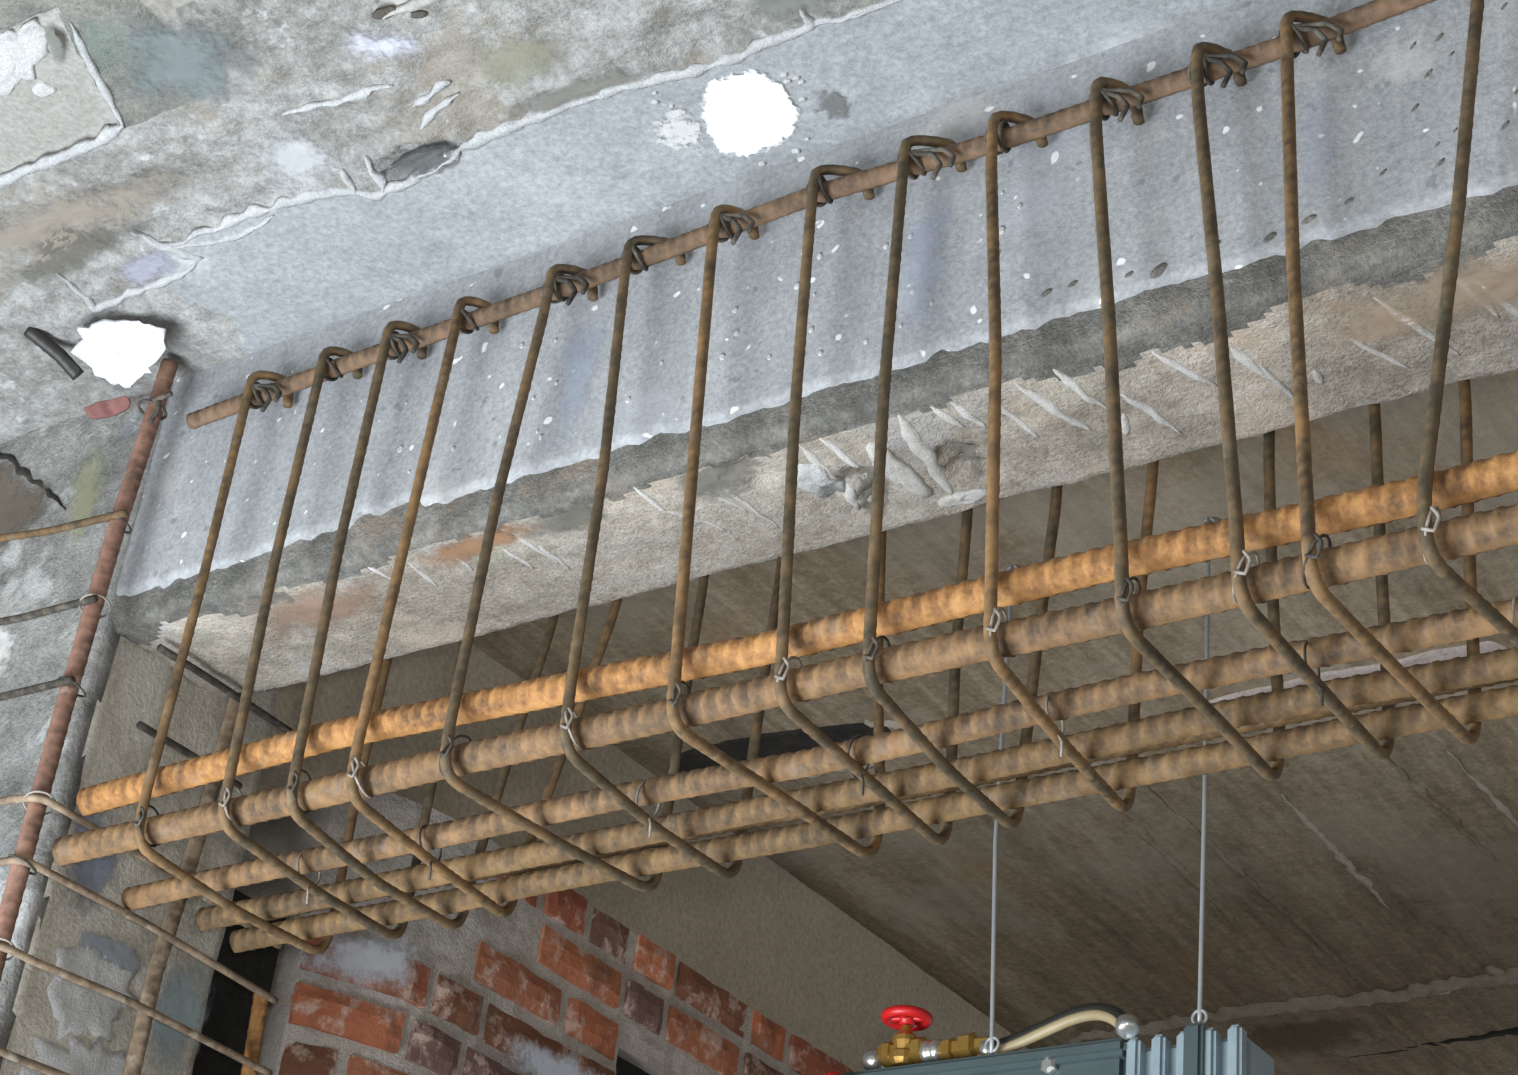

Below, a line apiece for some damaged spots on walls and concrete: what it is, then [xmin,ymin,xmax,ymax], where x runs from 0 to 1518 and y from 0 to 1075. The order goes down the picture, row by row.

crack [56,0,903,313]
spalling [797,442,987,514]
corrosion [436,527,524,564]
peeling [1209,641,1508,703]
spalling [0,358,293,1075]
spalling [668,719,901,772]
crack [1068,966,1518,1044]